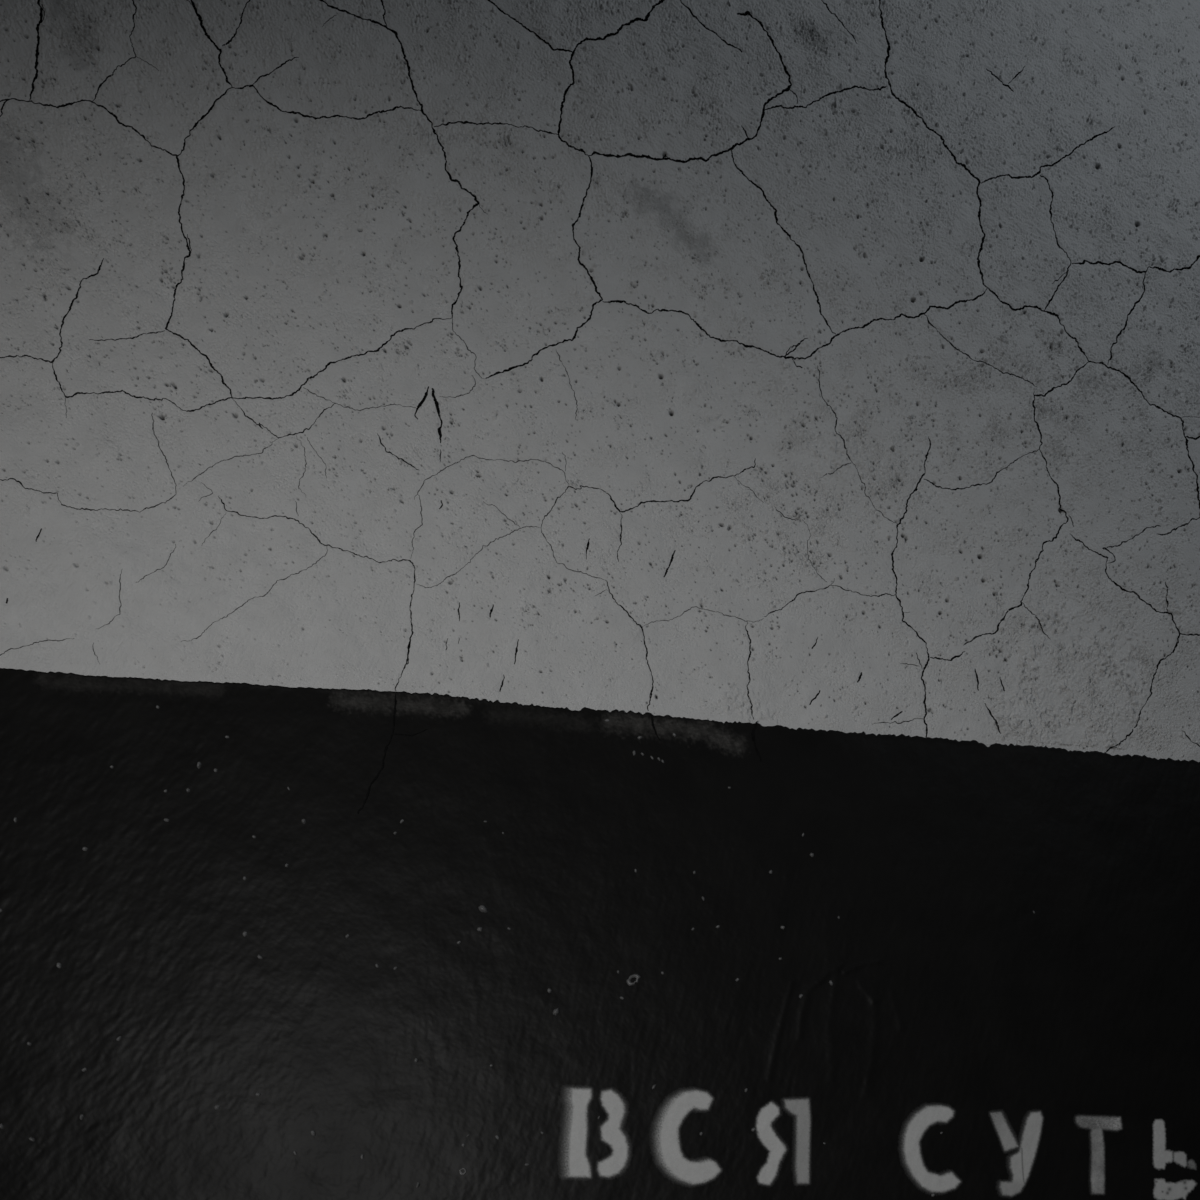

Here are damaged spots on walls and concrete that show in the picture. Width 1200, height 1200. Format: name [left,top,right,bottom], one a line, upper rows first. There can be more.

crack [0,0,1200,814]